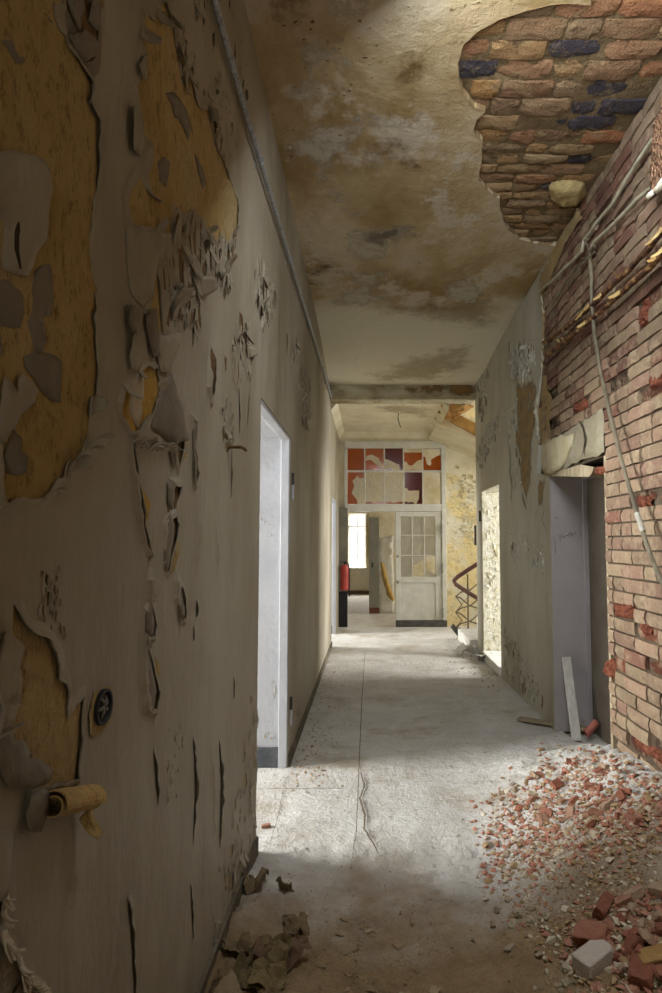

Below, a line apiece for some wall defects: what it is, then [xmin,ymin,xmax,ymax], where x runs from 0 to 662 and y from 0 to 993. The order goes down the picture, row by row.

peeling [0,0,240,562]
peeling [219,248,281,451]
peeling [274,117,362,179]
spalling [458,0,662,772]
peeling [359,367,545,713]
peeling [0,563,107,839]
peeling [0,893,76,993]